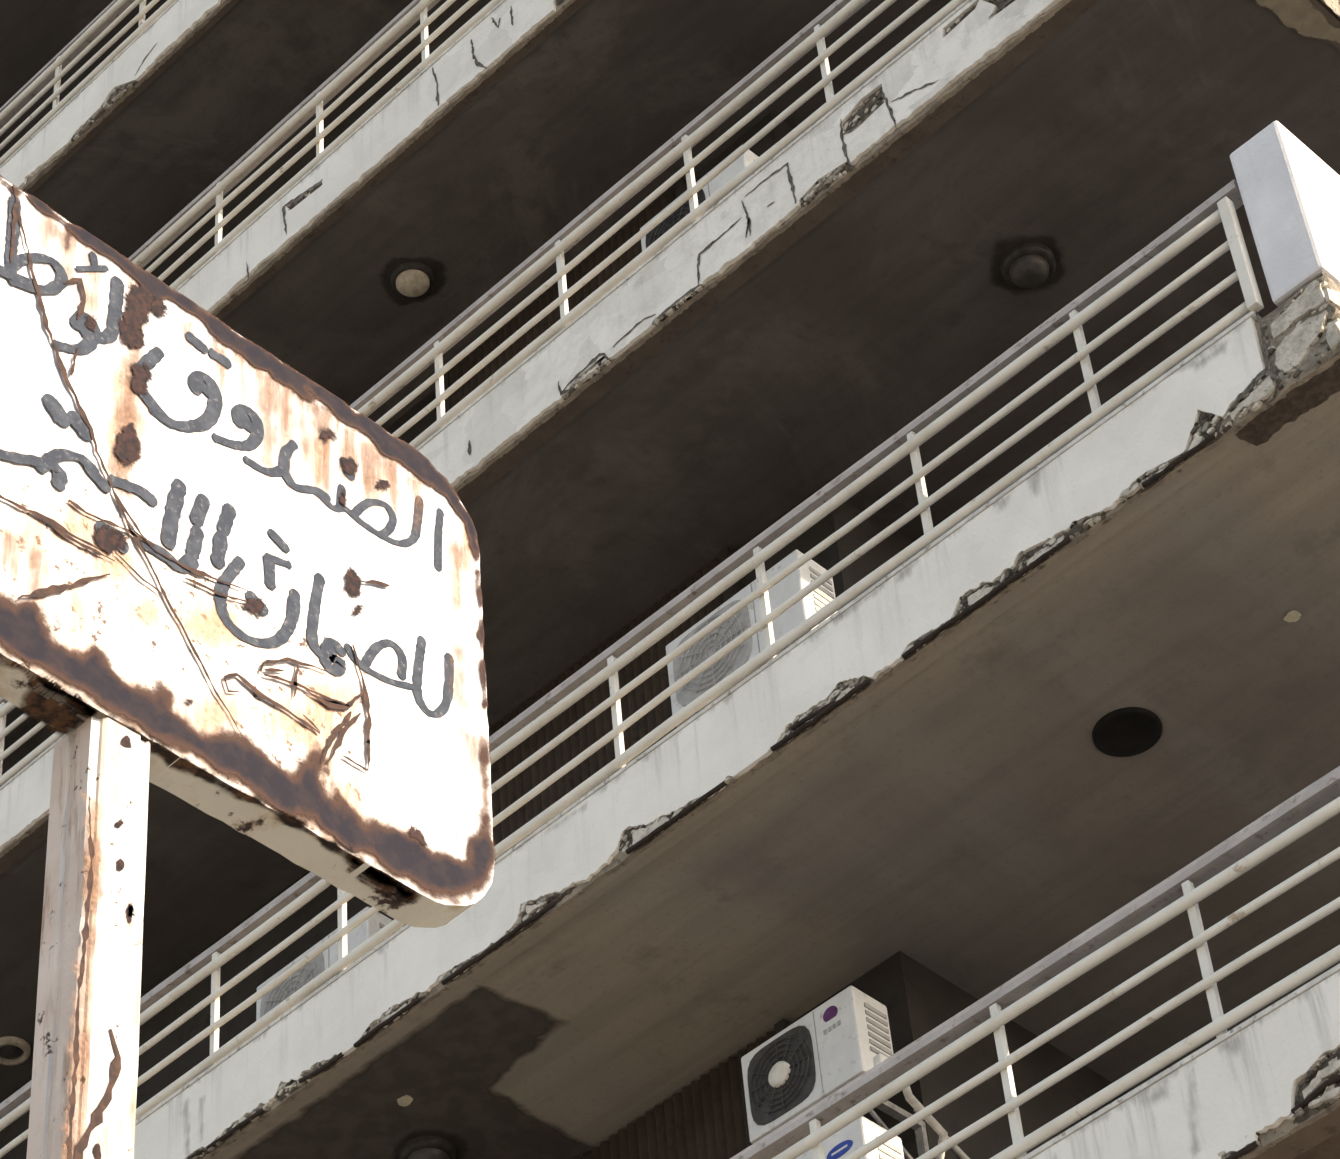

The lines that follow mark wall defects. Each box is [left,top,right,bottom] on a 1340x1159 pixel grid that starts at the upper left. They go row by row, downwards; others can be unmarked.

crack [470,6,513,69]
crack [989,0,1011,18]
crack [431,68,439,106]
crack [840,80,938,165]
crack [558,162,796,395]
spalling [1119,273,1340,504]
spalling [902,511,1106,661]
spalling [770,676,873,751]
spalling [619,775,740,854]
corrosion [63,796,102,1159]
leakage [239,987,592,1159]
spalling [1289,1047,1340,1124]